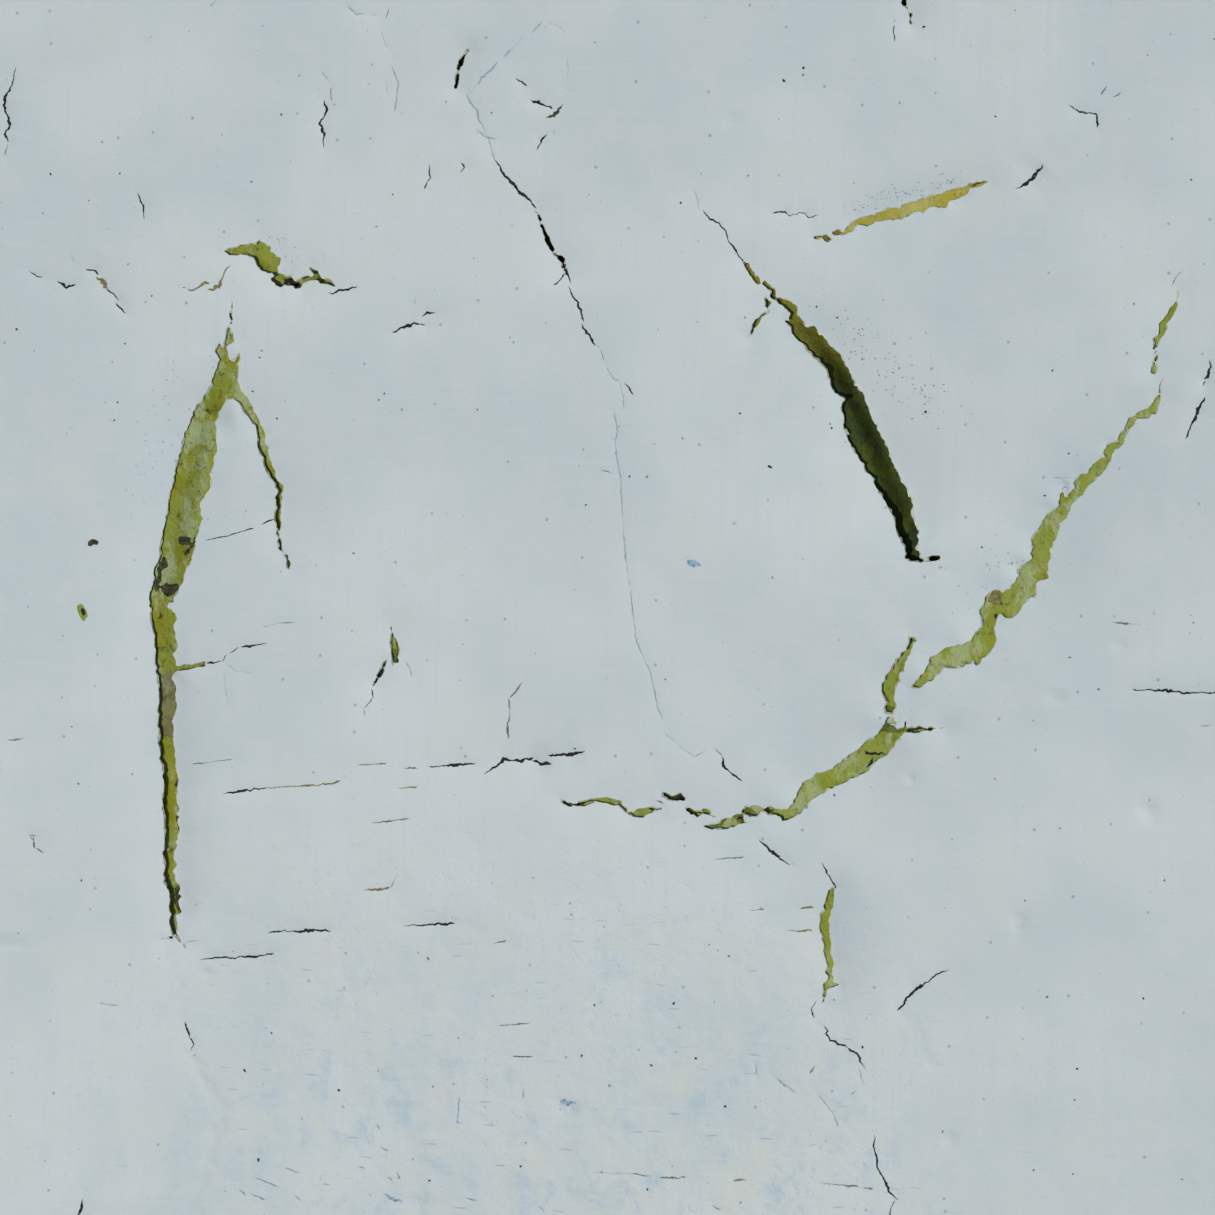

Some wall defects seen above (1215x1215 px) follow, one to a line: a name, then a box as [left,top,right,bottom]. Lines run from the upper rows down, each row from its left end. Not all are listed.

crack [893,0,913,41]
crack [3,71,15,153]
crack [392,302,434,333]
crack [1185,359,1212,439]
crack [454,22,1181,864]
crack [149,239,356,960]
crack [364,626,412,712]
crack [1133,688,1215,696]
crack [223,684,585,794]
crack [755,865,865,1126]
crack [897,970,948,1011]
crack [825,1139,899,1215]